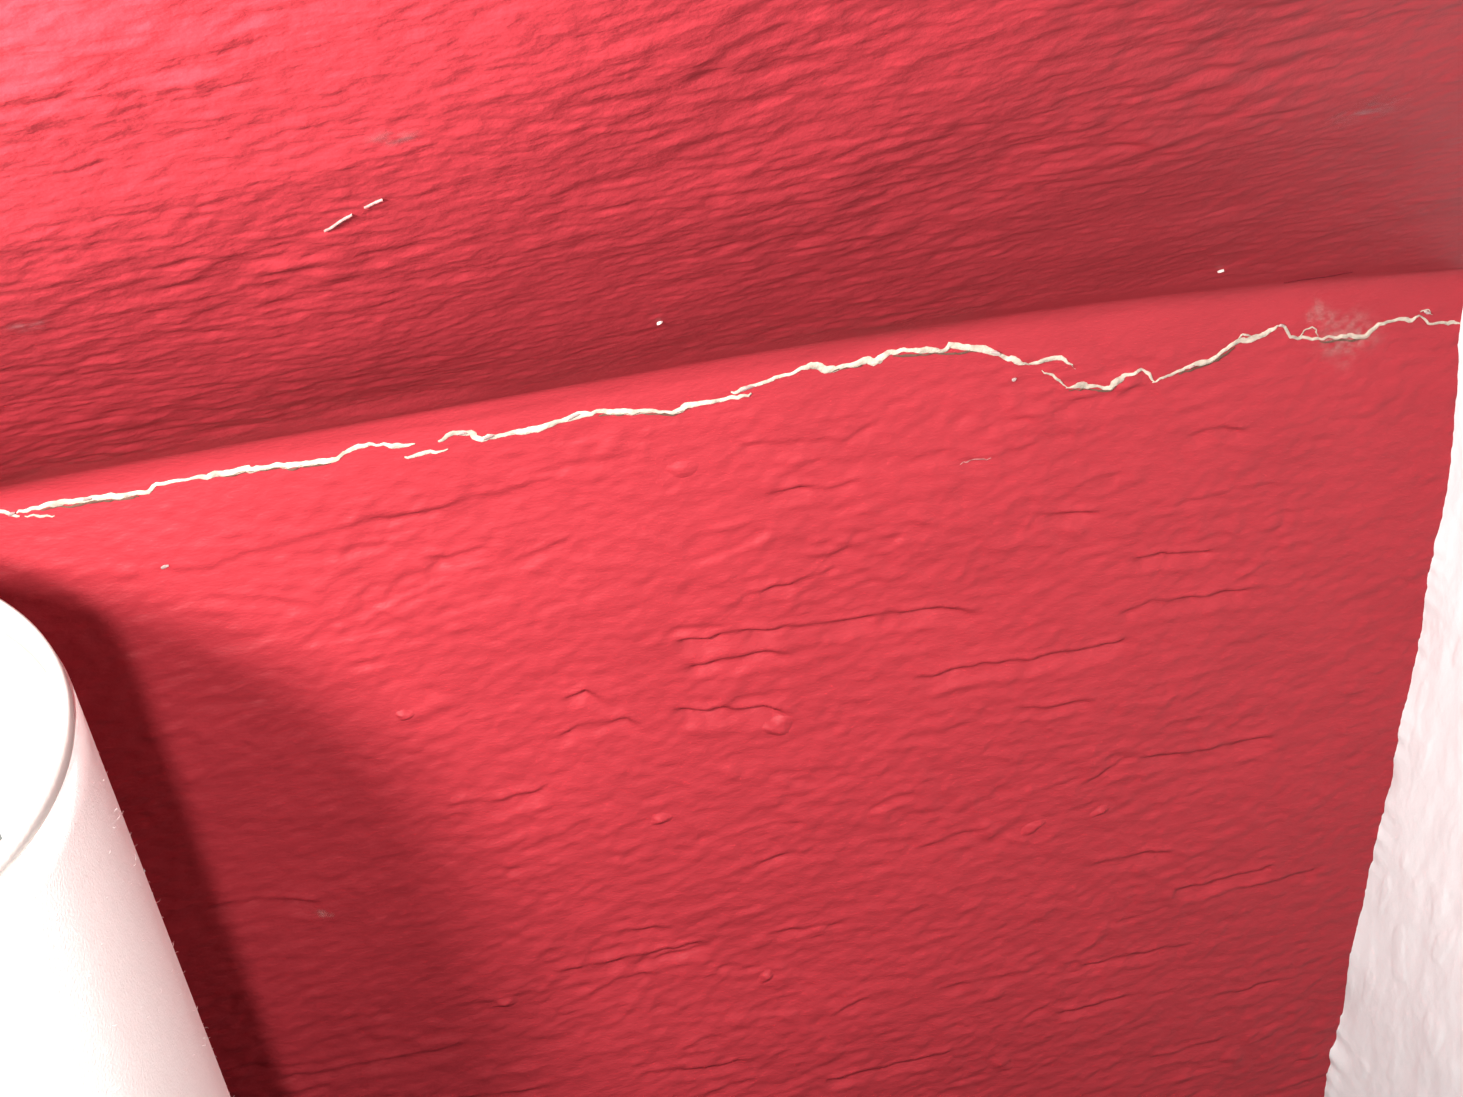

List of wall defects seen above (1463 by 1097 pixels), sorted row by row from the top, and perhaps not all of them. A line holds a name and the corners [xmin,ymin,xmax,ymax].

crack [1284,271,1352,283]
crack [0,309,1461,518]